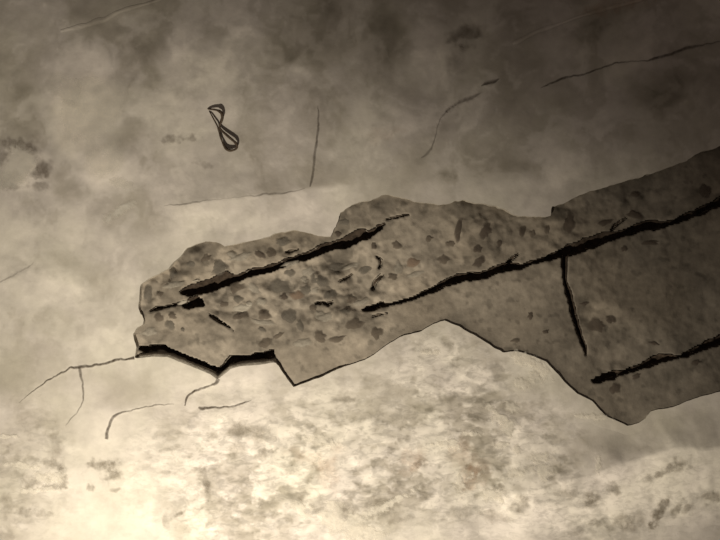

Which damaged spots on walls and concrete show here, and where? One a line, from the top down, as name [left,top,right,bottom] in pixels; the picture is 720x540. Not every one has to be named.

crack [150,214,409,328]
crack [362,197,720,355]
crack [27,344,275,410]
crack [592,334,720,383]